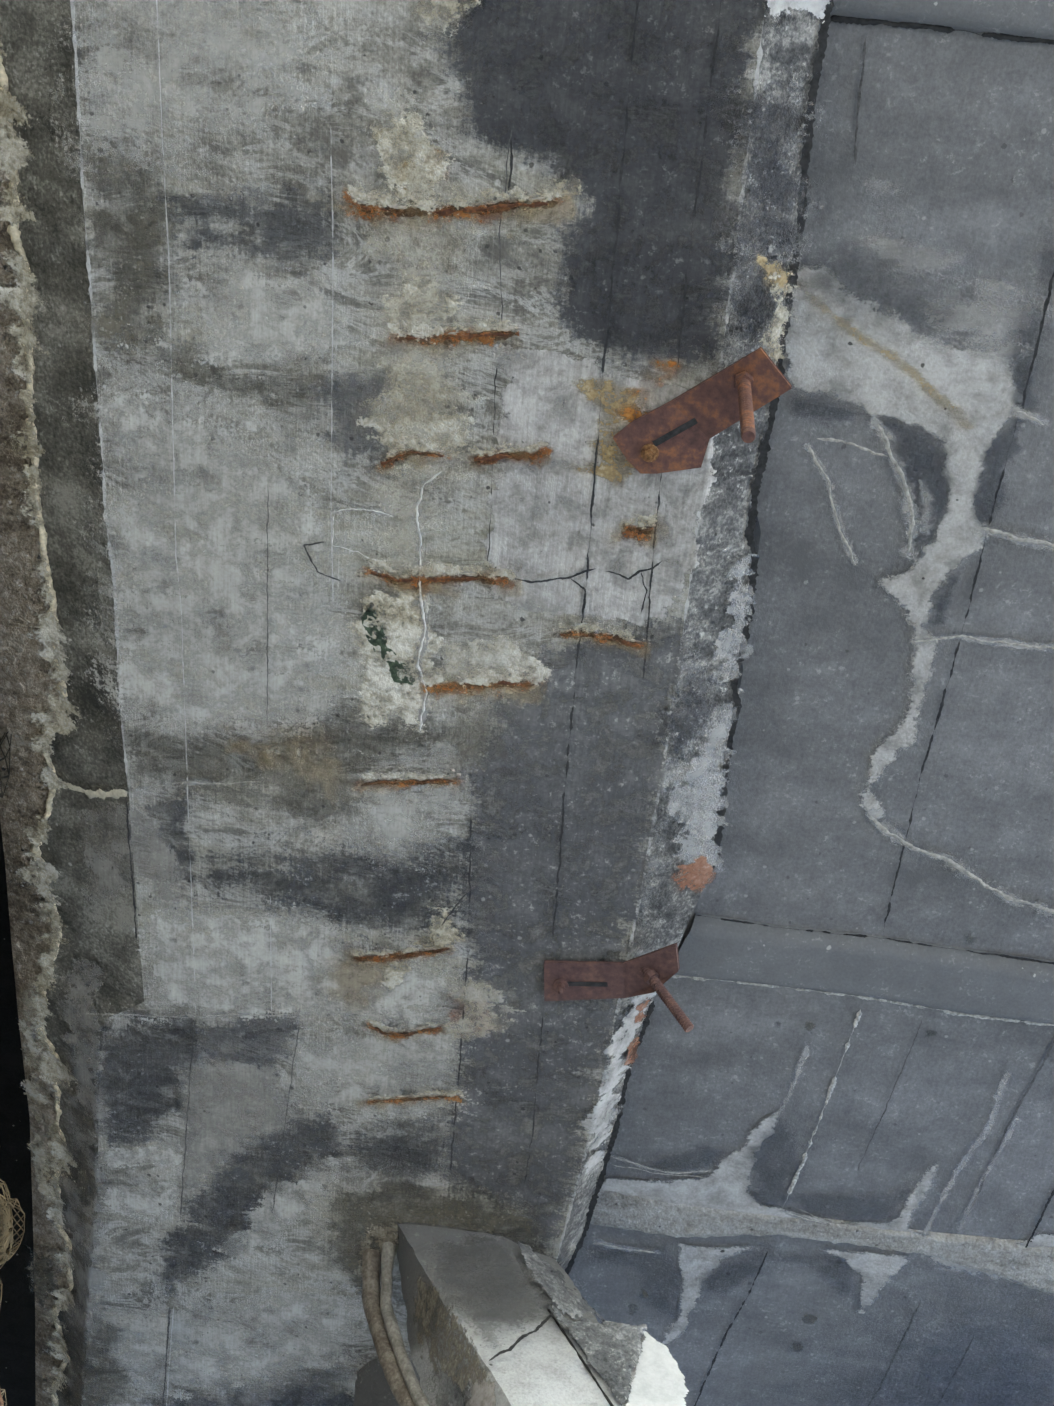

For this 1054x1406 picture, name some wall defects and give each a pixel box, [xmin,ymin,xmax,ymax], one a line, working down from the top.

peeling [764,0,830,23]
spalling [342,182,566,229]
spalling [387,314,519,349]
damp [759,275,800,365]
rust [576,360,680,485]
damp [872,417,951,558]
damp [974,375,1039,521]
spalling [358,559,516,591]
damp [0,35,359,1406]
spalling [420,663,554,697]
rust [623,997,651,1066]
damp [310,1160,588,1287]